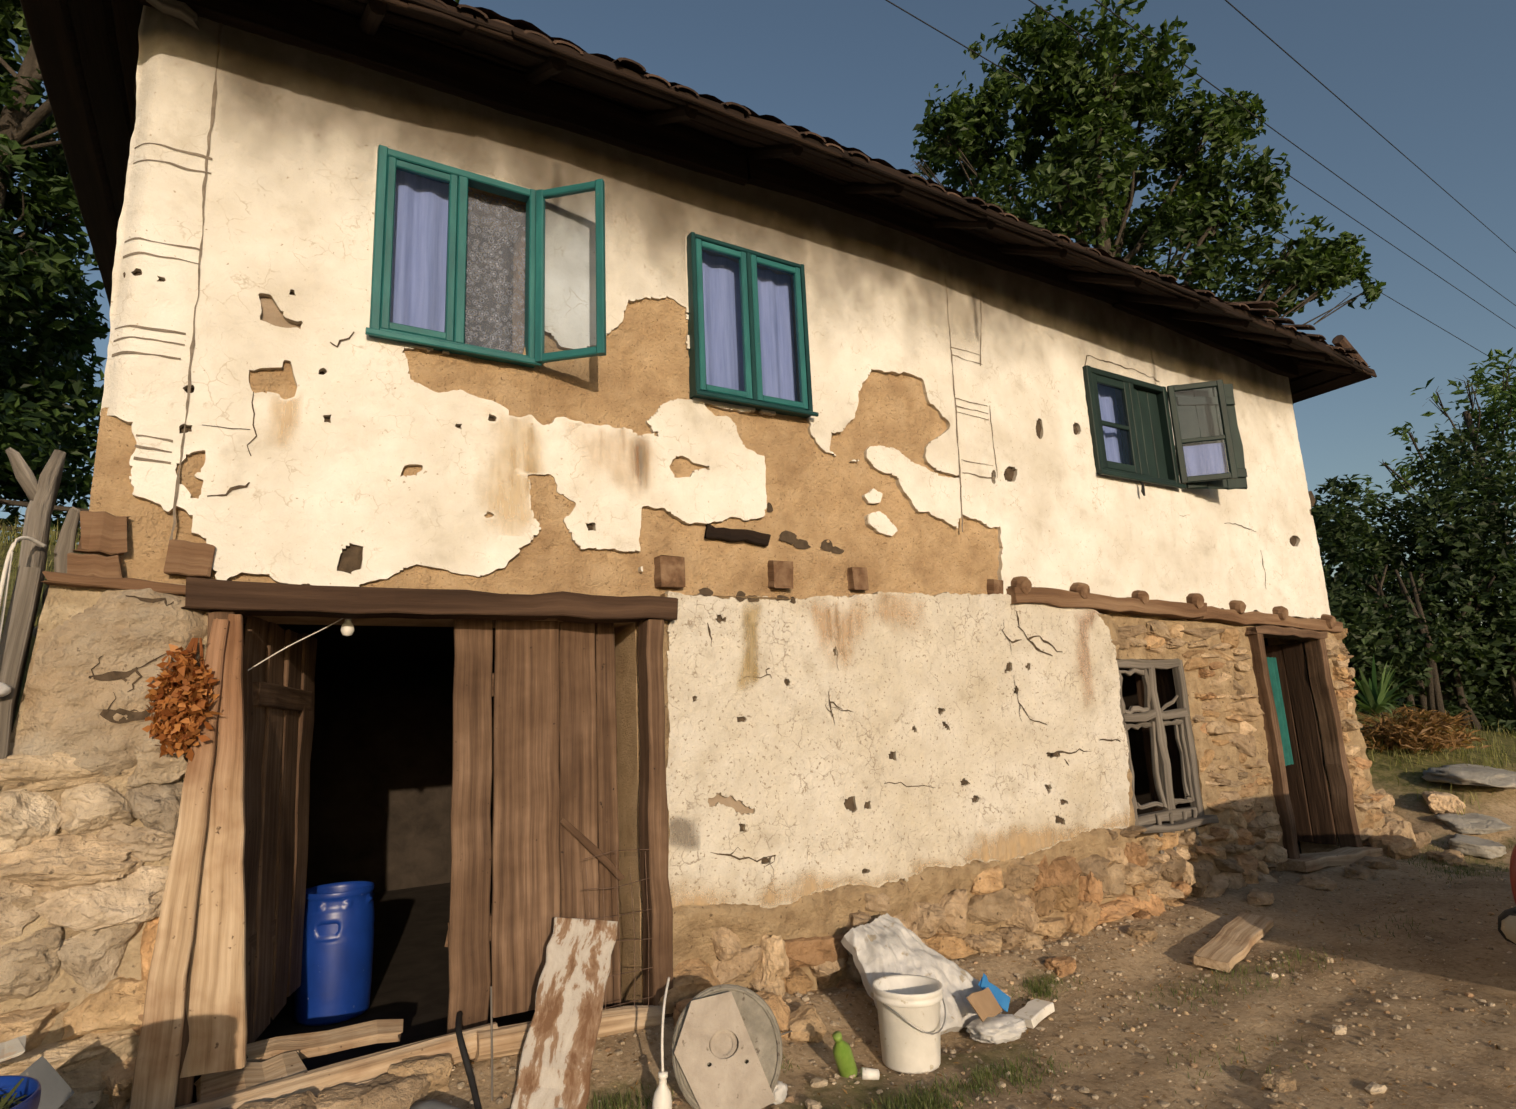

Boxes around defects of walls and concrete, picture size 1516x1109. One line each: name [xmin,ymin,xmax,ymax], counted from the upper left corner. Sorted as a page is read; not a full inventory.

spalling [259,296,301,329]
spalling [249,362,297,399]
flaking render [84,407,206,584]
crack [206,391,257,497]
flaking render [337,297,1000,604]
flaking render [205,571,277,583]
damp [740,609,757,685]
crack [1002,613,1120,765]